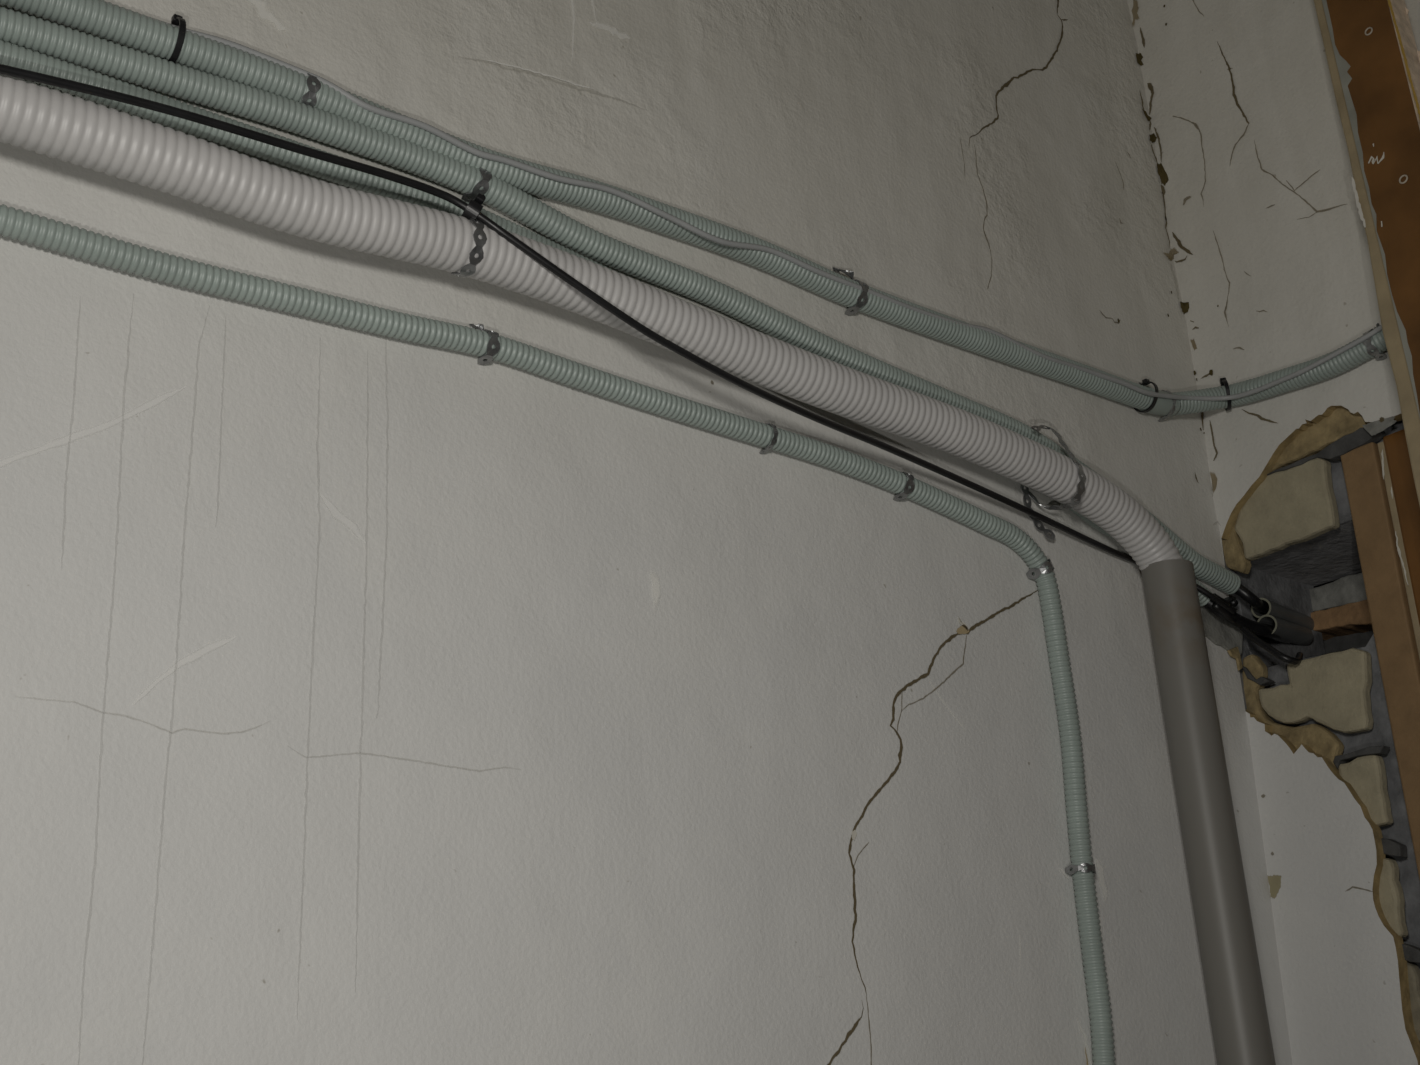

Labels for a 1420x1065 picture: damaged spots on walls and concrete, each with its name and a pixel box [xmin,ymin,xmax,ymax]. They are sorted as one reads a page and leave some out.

crack [960,0,1068,289]
crack [1115,0,1346,492]
crack [827,590,1038,1065]
flaking render [1200,408,1420,1042]